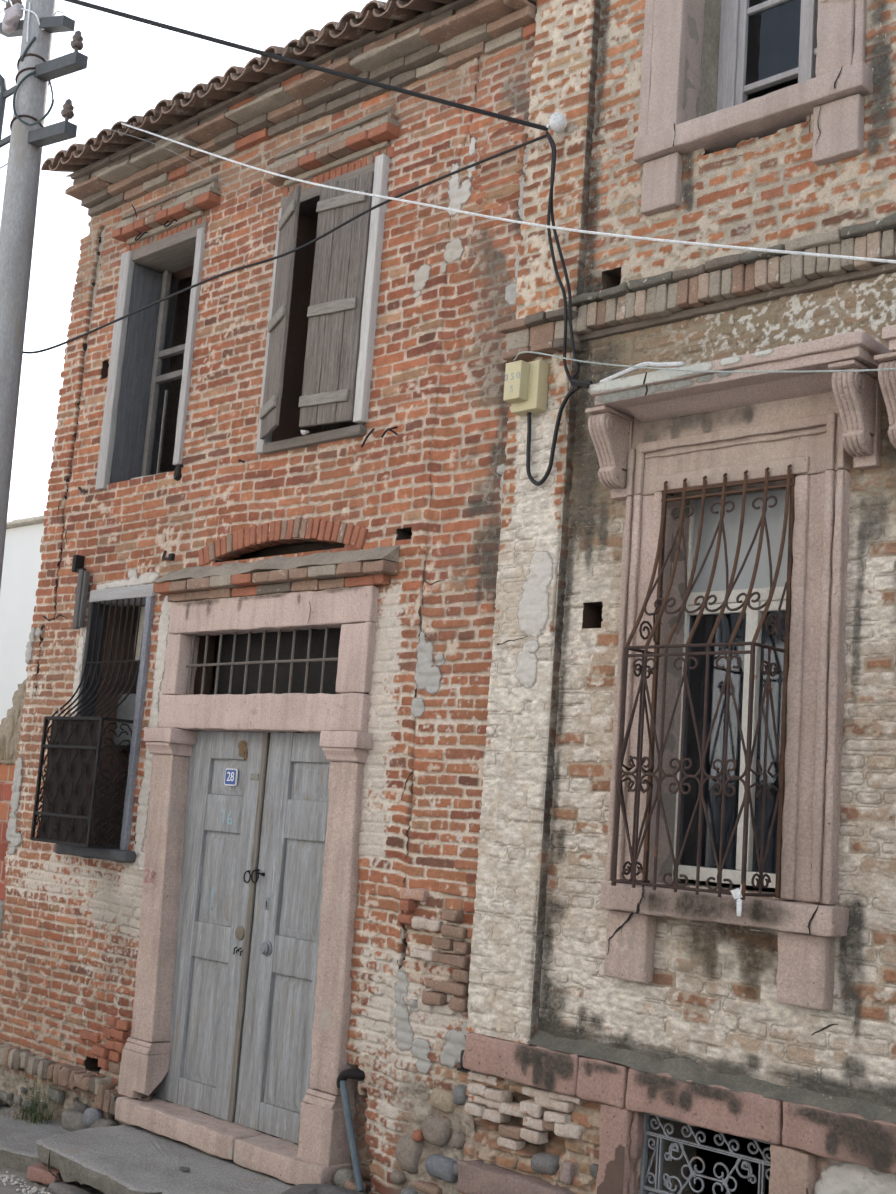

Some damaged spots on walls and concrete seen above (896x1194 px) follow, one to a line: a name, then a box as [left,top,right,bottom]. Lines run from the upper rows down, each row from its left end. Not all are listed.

spalling [397,888,471,1036]
crack [607,886,645,955]
water stain [689,901,774,992]
crack [807,905,819,935]
water stain [840,900,863,1035]
peeling [411,1038,433,1074]
water stain [635,1072,739,1113]
water stain [654,1052,758,1075]
water stain [783,1059,896,1108]
spalling [390,1071,588,1194]
spalling [590,1112,664,1194]
water stain [799,1107,896,1173]